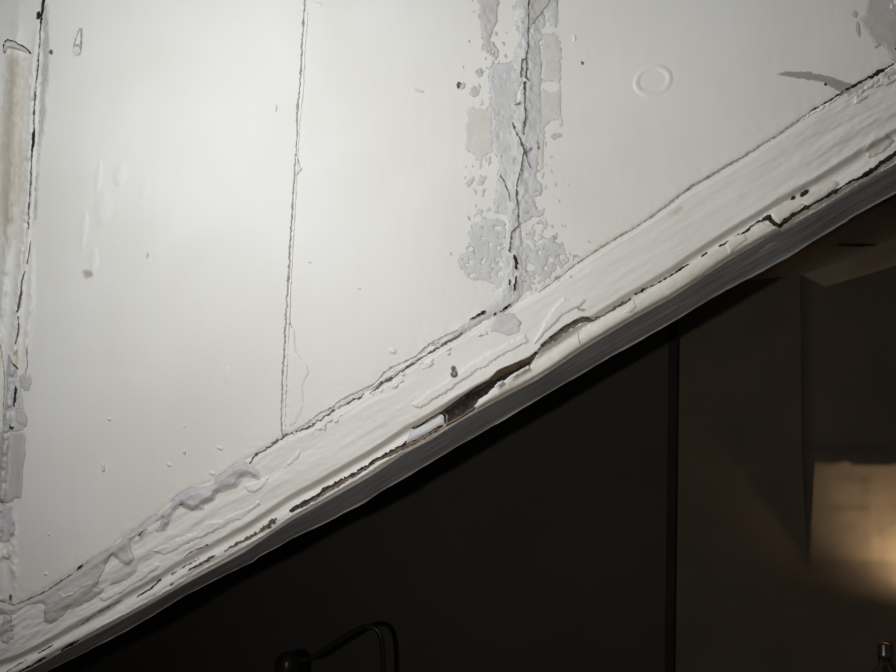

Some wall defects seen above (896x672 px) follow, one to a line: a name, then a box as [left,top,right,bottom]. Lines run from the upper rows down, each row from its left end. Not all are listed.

crack [0,0,45,429]
crack [249,0,539,464]
peeling [456,28,507,110]
peeling [410,155,896,410]
crack [538,48,896,293]
peeling [863,134,894,158]
crack [7,151,896,672]